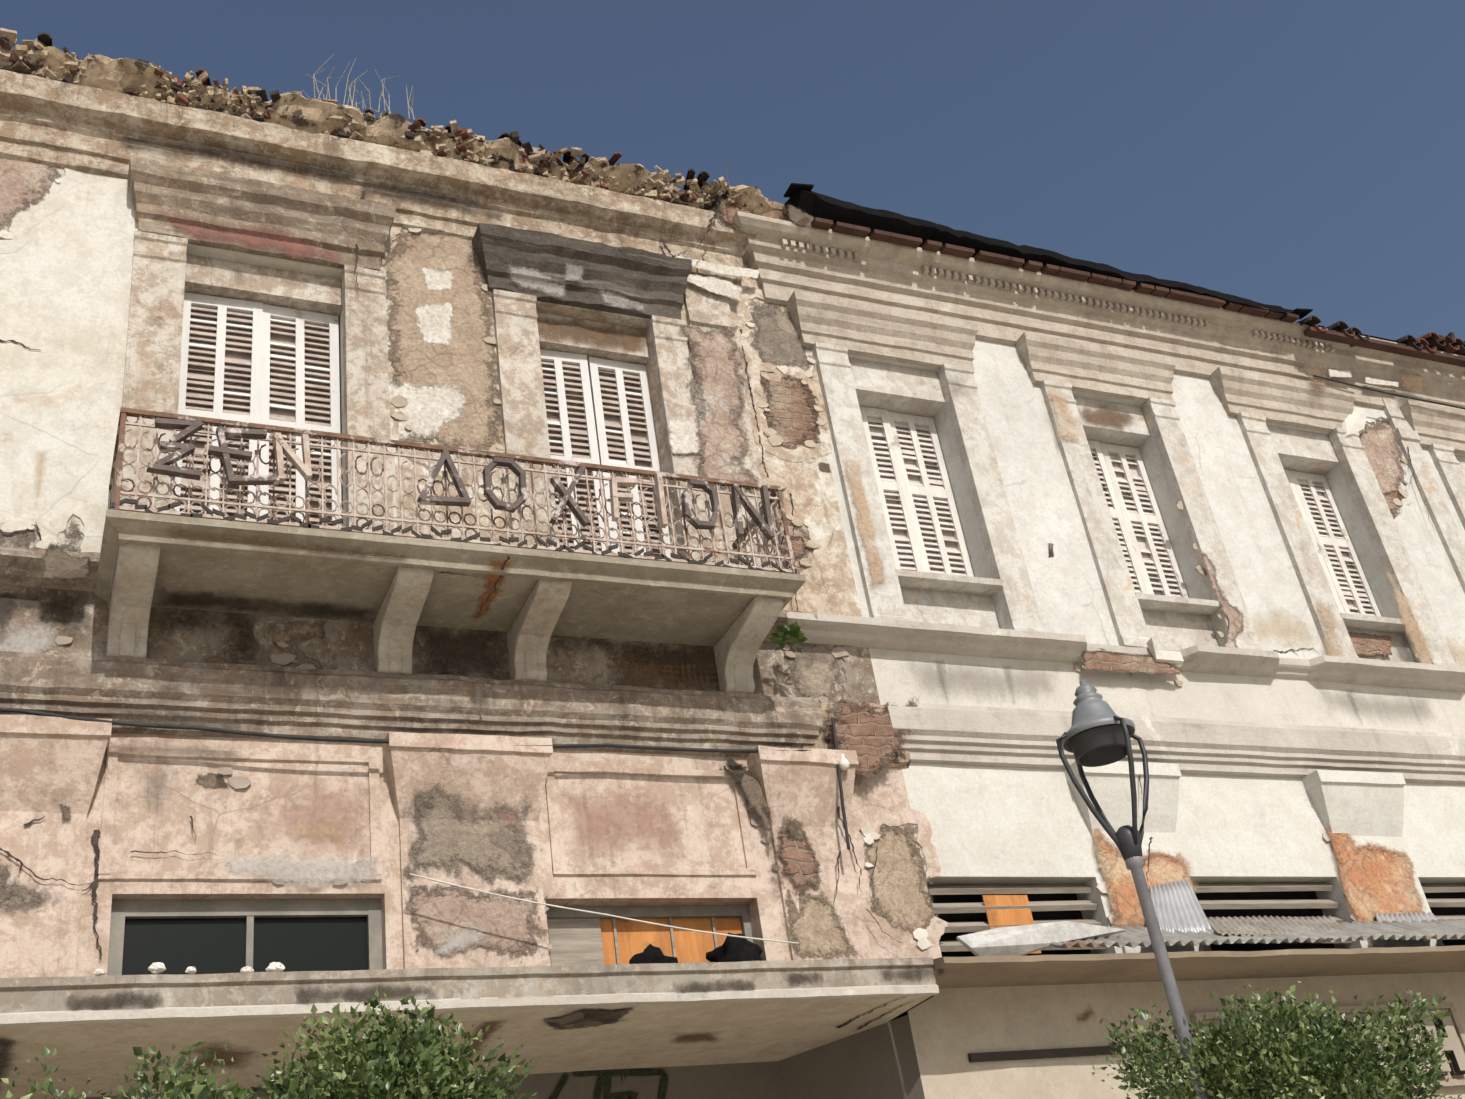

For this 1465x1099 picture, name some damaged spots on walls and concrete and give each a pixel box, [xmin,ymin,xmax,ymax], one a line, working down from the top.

spalling [0,157,83,253]
spalling [668,255,886,590]
spalling [1359,409,1417,530]
spalling [0,499,104,580]
rust [473,561,510,618]
spalling [1190,527,1244,648]
spalling [769,641,920,786]
crack [0,816,217,959]
spalling [403,783,553,958]
spalling [850,808,948,958]
spalling [1094,829,1196,928]
spalling [1322,827,1423,923]